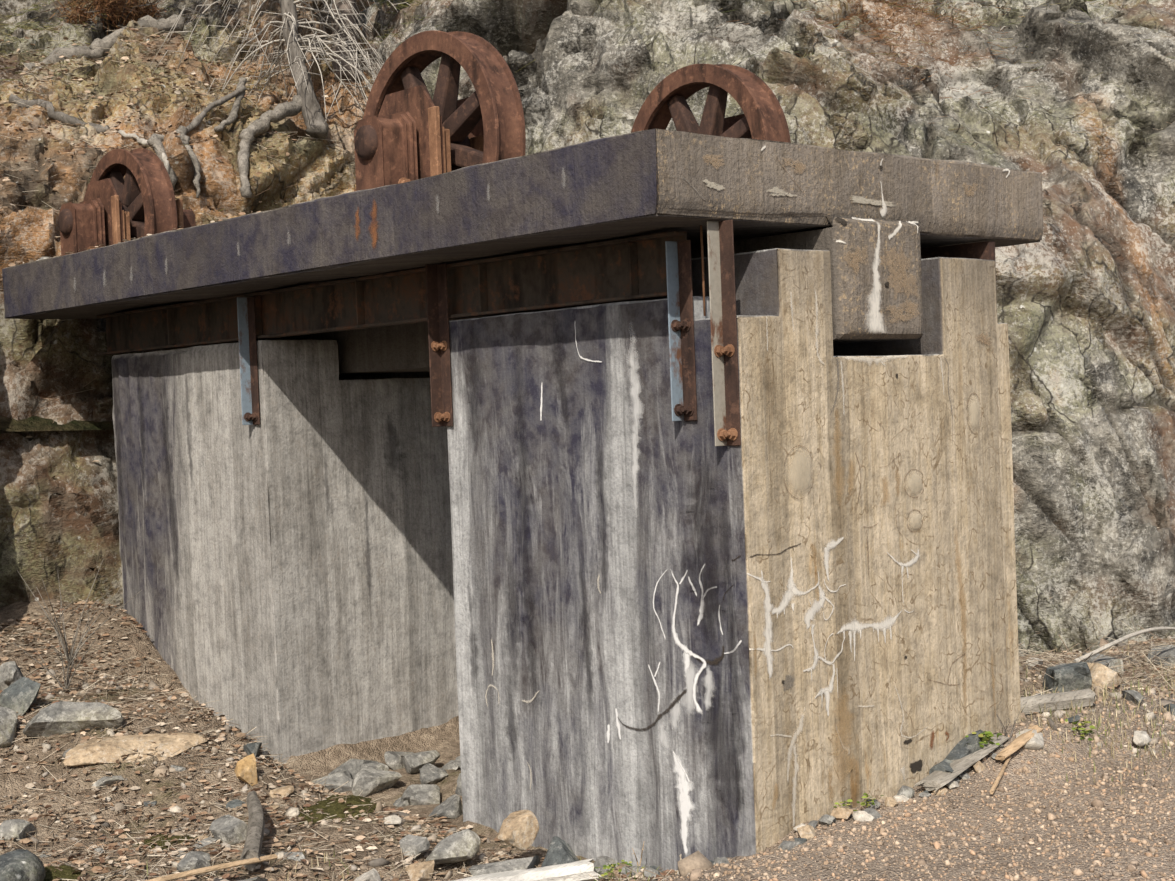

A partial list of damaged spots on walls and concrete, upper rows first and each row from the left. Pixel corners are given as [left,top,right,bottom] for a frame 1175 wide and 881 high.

leakage [630,347,643,509]
leakage [659,664,712,749]